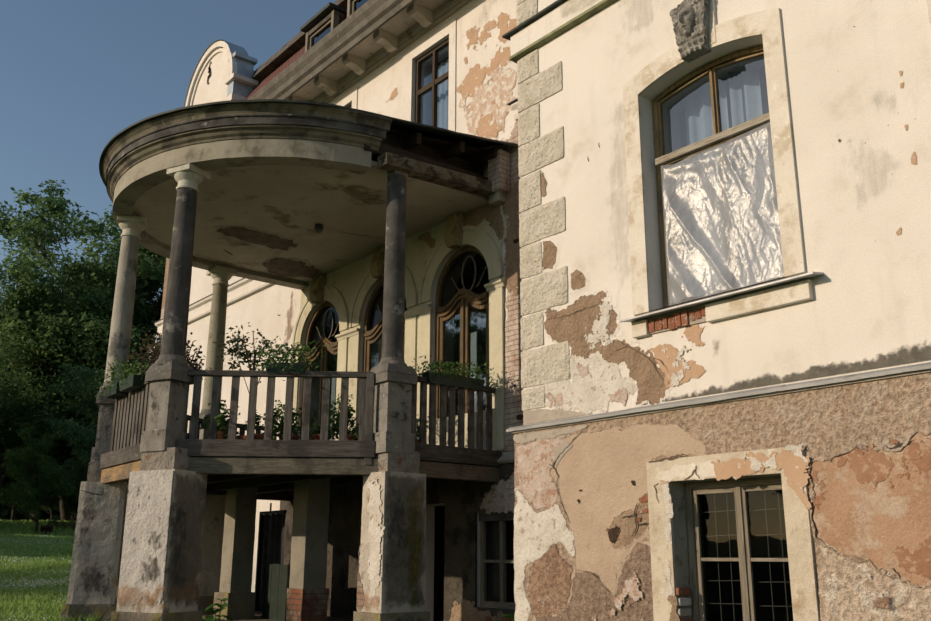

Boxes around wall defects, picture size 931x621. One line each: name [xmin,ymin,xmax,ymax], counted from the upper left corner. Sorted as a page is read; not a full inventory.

peeling [161,258,170,319]
spalling [449,12,931,621]
water stain [643,346,931,405]
crack [549,432,581,521]
water stain [142,475,207,608]